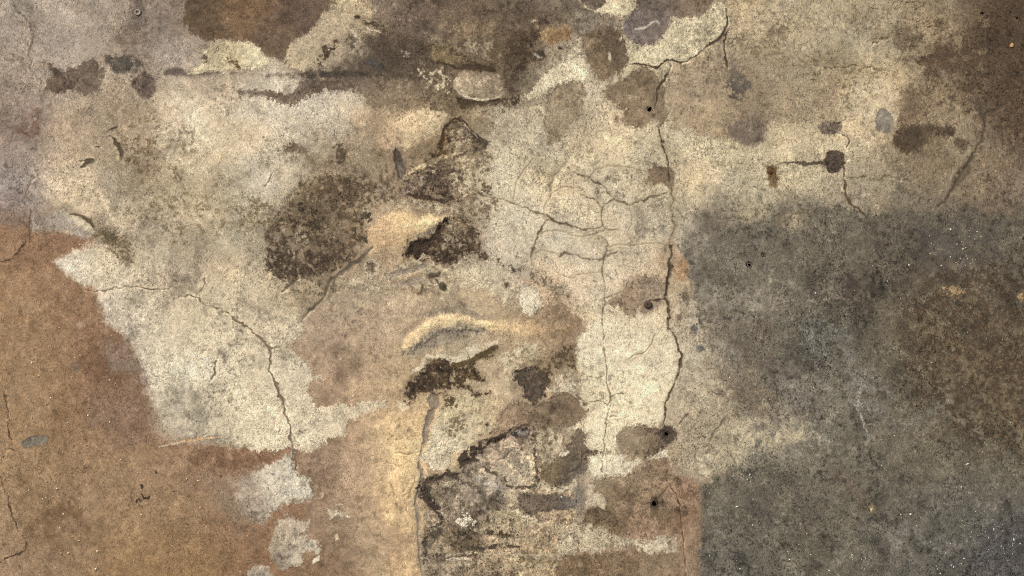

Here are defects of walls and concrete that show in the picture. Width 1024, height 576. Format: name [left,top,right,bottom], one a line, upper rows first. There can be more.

crack [80,243,375,475]
water stain [9,0,473,319]
water stain [232,0,715,139]
water stain [396,336,585,412]
spalling [412,273,708,576]
crack [470,8,733,474]
water stain [674,292,711,356]
water stain [695,451,718,478]
water stain [771,202,818,238]
water stain [660,0,1024,189]
water stain [840,270,861,303]
crack [835,94,1007,229]